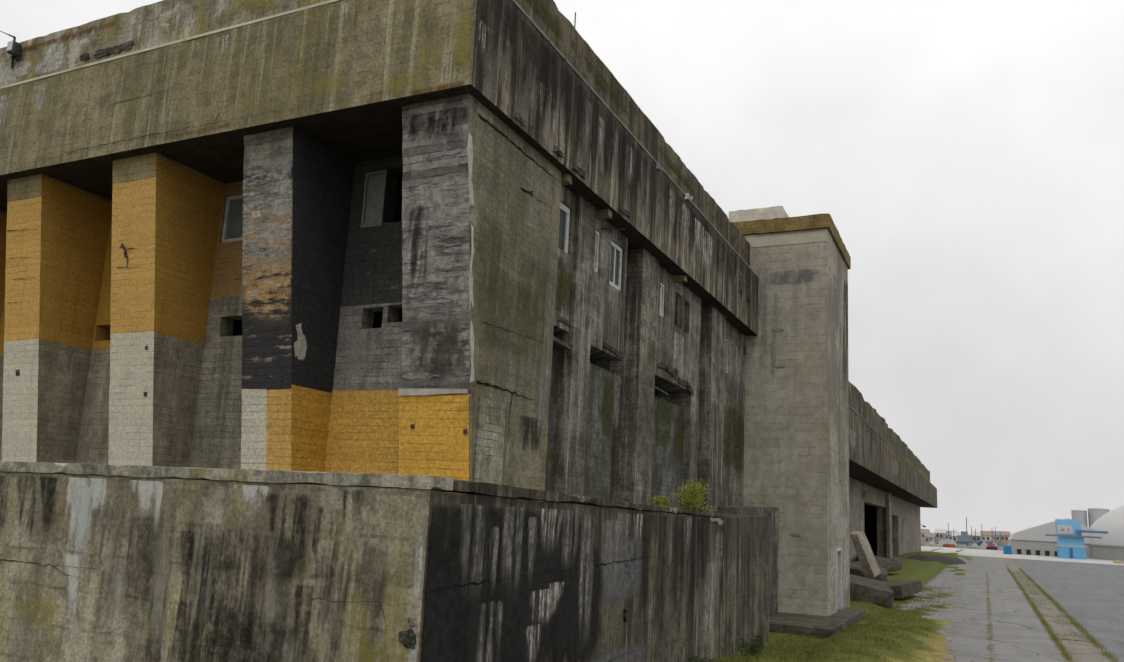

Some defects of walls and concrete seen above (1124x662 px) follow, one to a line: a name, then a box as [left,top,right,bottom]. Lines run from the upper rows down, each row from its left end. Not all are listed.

damp [480,0,740,294]
damp [521,263,573,447]
damp [723,408,744,473]
crack [0,559,97,577]
damp [112,480,313,662]
damp [234,485,336,597]
damp [421,505,724,662]